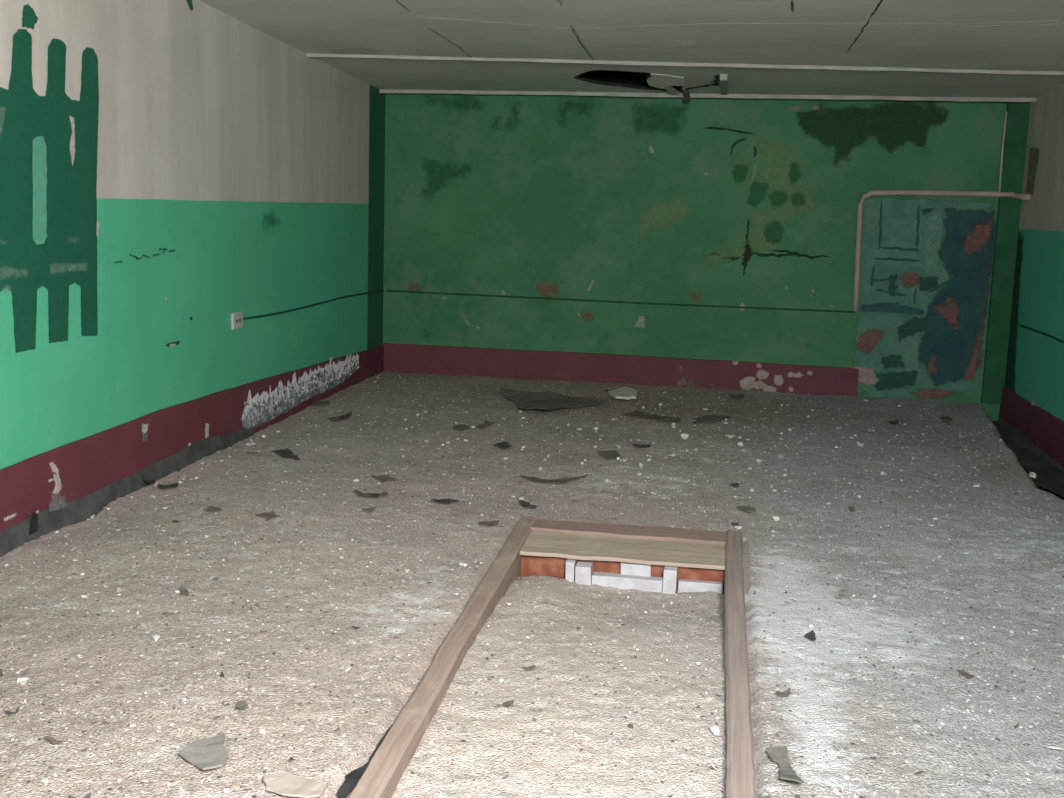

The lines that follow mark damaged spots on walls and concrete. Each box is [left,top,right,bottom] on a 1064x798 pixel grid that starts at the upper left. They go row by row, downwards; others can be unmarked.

crack [557,0,596,61]
crack [846,0,883,53]
crack [706,127,757,186]
crack [701,219,829,276]
water stain [241,352,359,430]
spalling [739,362,813,392]